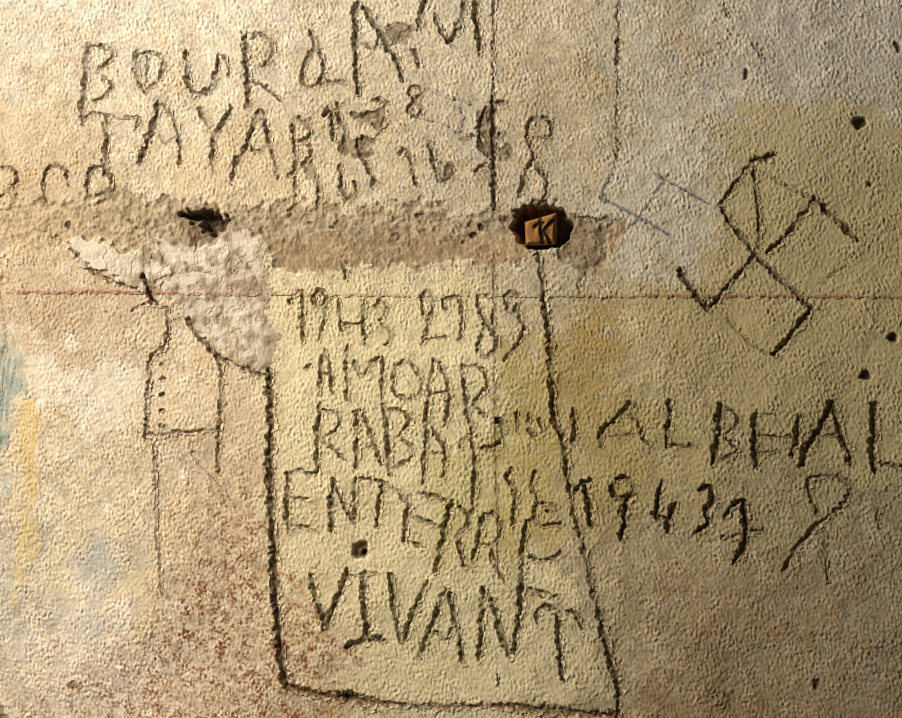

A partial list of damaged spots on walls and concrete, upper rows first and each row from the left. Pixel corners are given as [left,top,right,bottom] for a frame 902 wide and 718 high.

spalling [0,184,628,381]